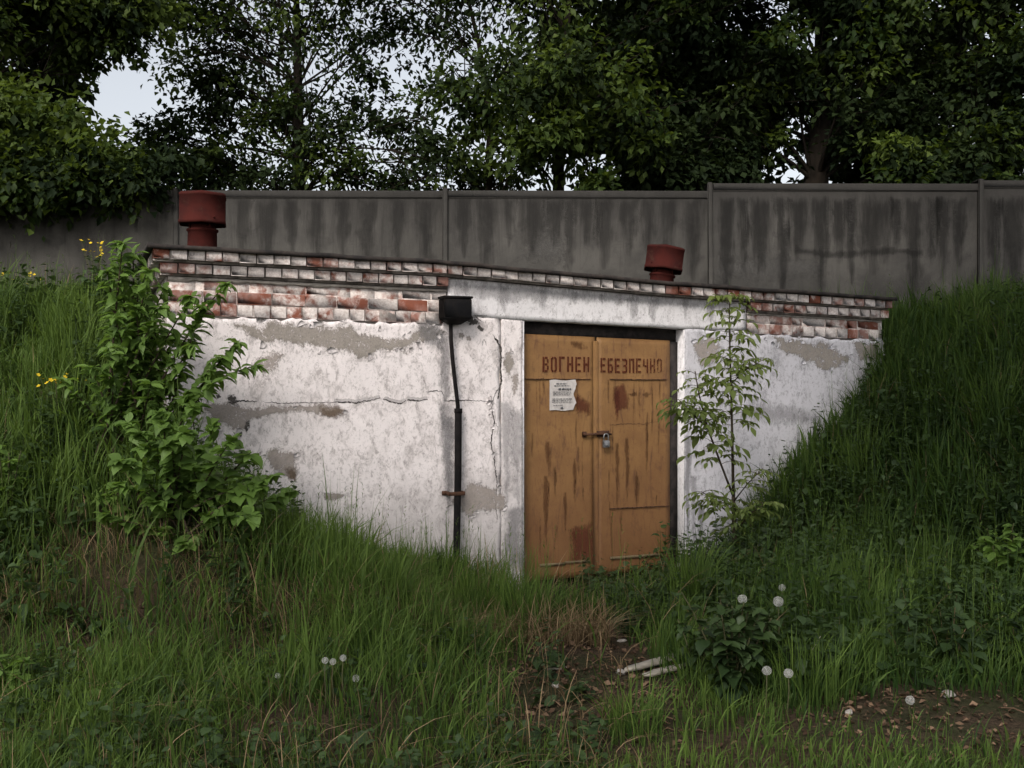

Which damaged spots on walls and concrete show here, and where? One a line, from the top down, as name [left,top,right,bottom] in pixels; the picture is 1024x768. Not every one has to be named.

peeling [234,316,484,376]
peeling [764,336,885,371]
peeling [201,394,348,437]
crack [236,315,504,514]
rust [614,385,628,416]
peeling [259,448,301,481]
peeling [446,482,508,518]